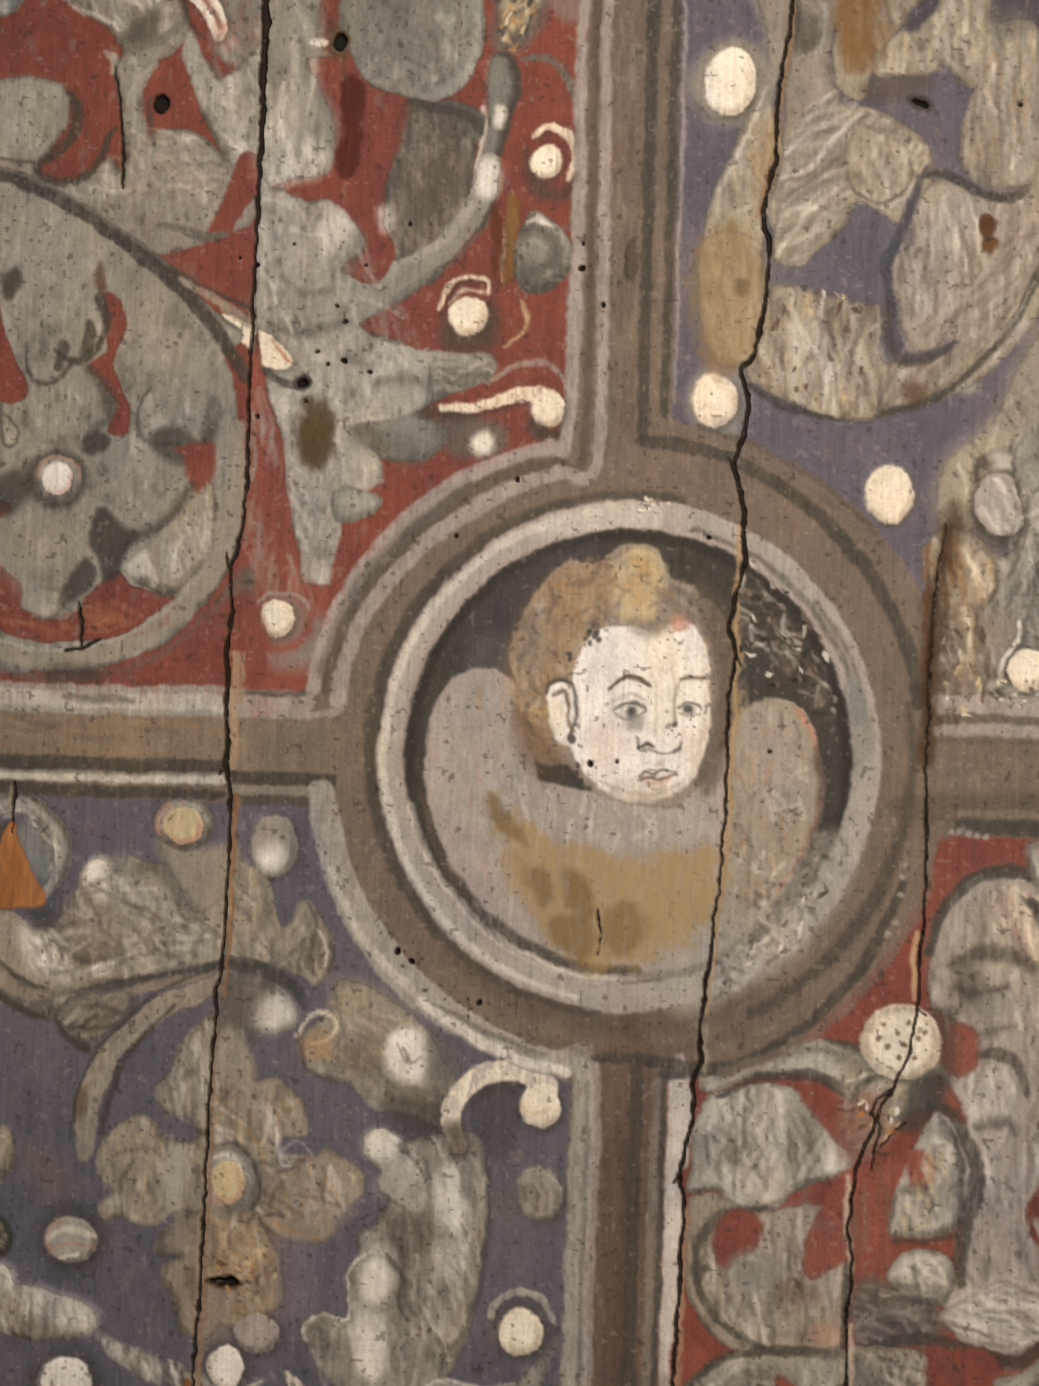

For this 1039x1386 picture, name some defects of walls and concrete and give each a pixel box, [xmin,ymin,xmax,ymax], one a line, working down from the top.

crack [191,0,275,1386]
crack [671,0,797,1386]
crack [844,523,948,1386]